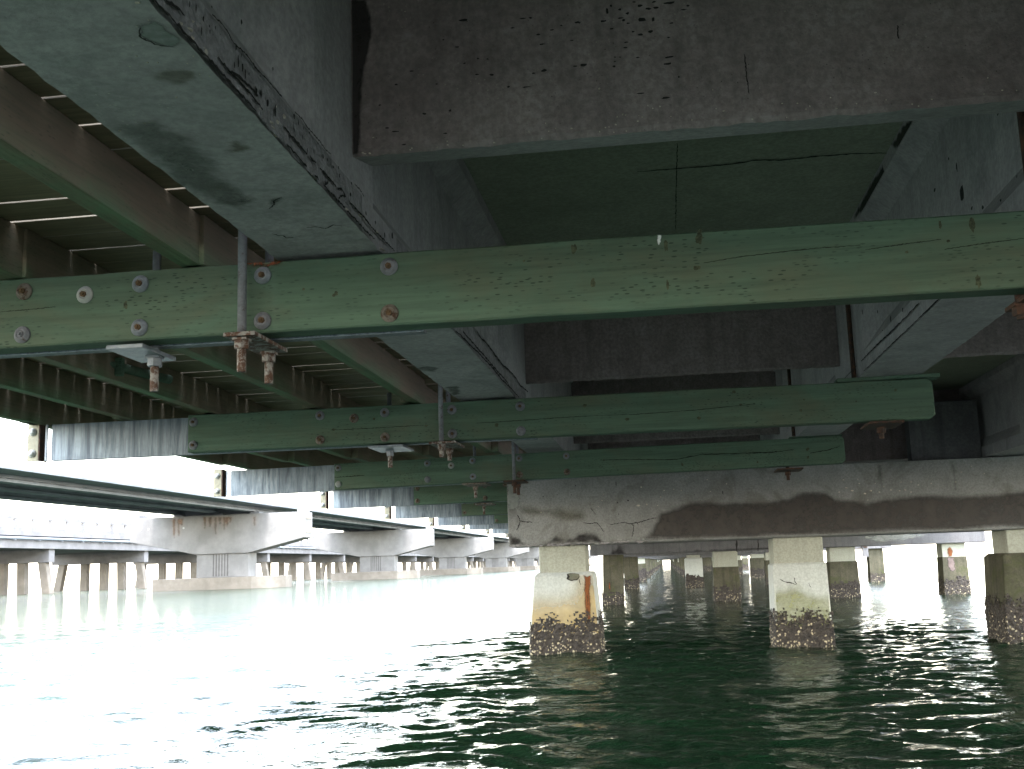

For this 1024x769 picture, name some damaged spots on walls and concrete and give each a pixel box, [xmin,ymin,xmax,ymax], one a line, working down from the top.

spalling [601,1,690,67]
spalling [139,0,409,252]
crack [637,144,876,228]
spalling [453,327,526,399]
crack [584,509,654,536]
damp [647,492,1024,552]